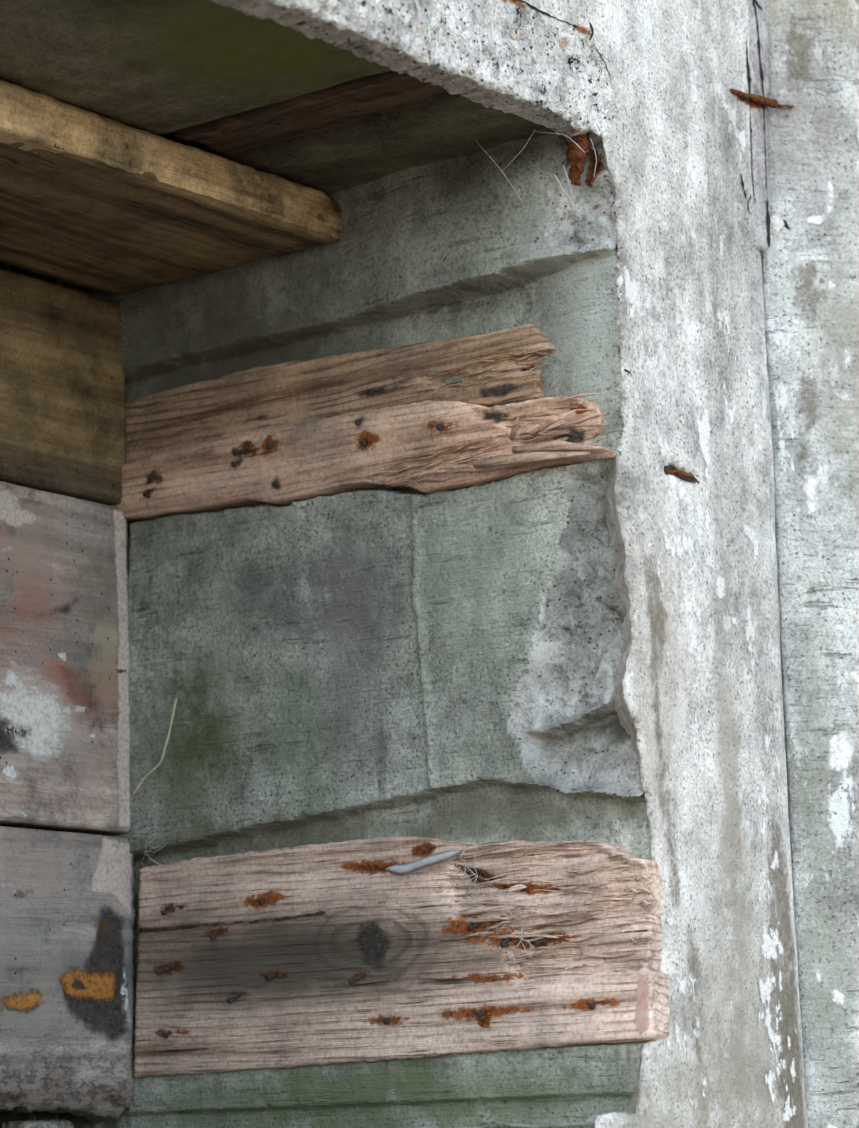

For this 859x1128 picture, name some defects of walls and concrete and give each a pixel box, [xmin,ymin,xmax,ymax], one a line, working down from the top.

spalling [210,0,617,255]
corrosion [585,149,605,187]
corrosion [737,96,766,108]
crack [741,0,790,247]
spalling [507,458,644,797]
leakage [757,781,803,1128]